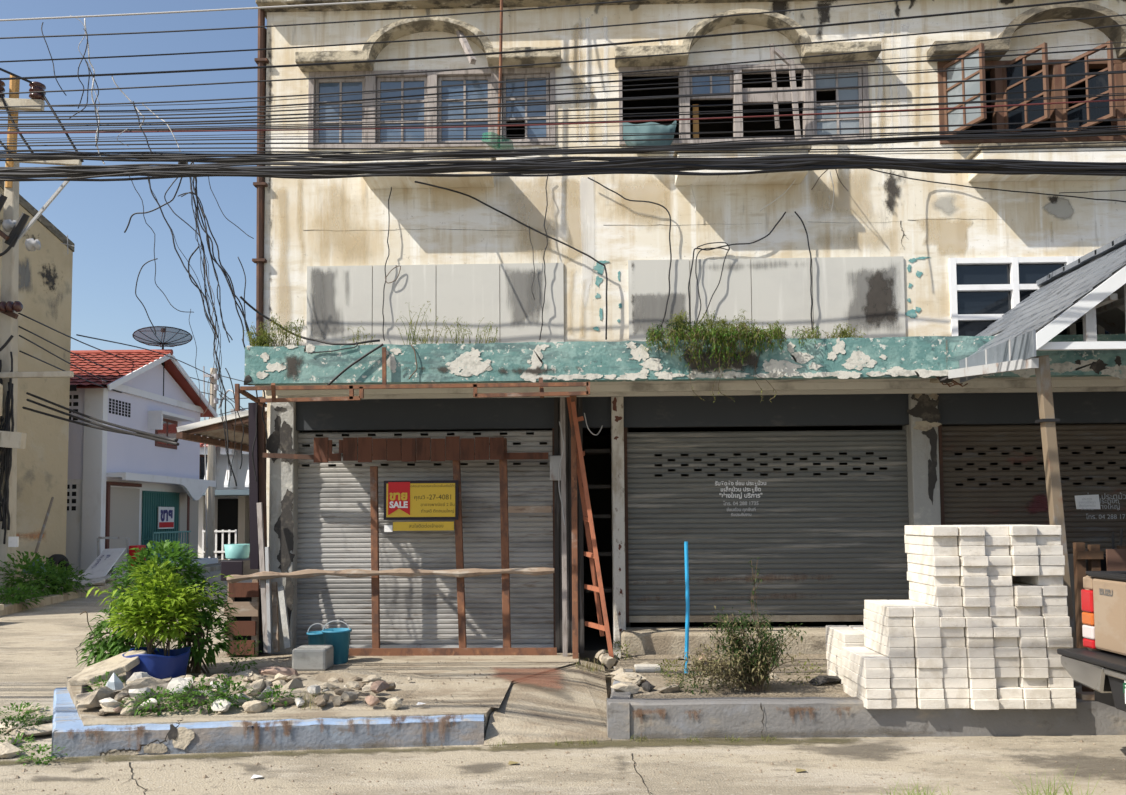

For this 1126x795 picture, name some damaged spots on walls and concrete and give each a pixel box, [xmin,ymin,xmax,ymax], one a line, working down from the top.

damp [817,0,836,38]
damp [884,172,905,211]
damp [312,270,344,336]
damp [508,271,542,323]
damp [632,293,685,333]
damp [848,266,898,330]
peeling [244,346,286,385]
peeling [445,347,492,377]
peeling [1050,356,1126,380]
peeling [267,406,296,464]
peeling [520,337,968,505]
peeling [274,489,295,629]